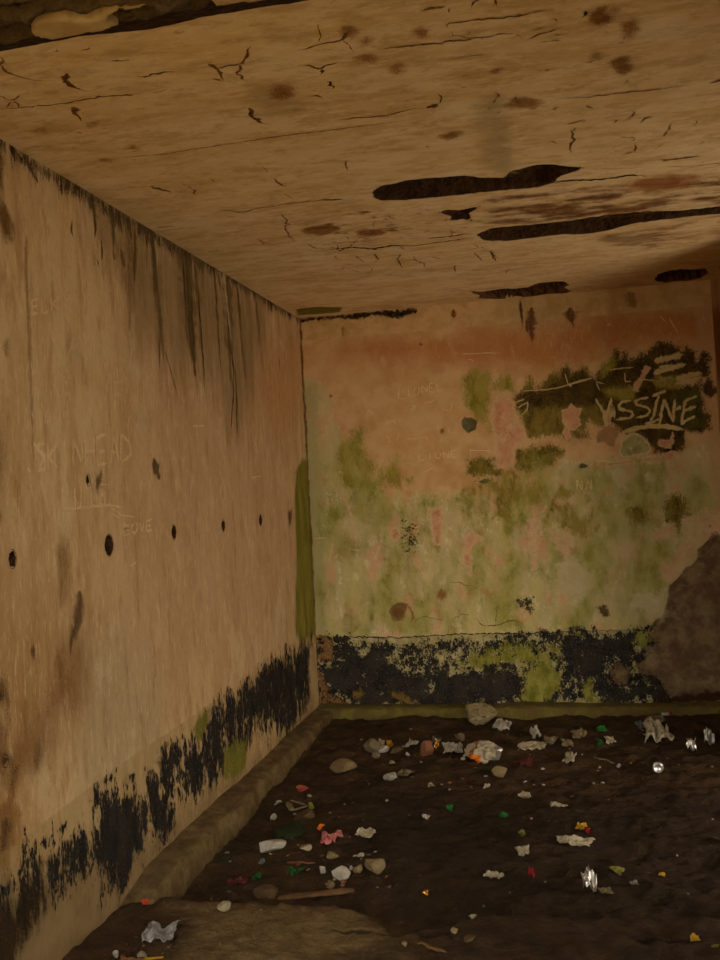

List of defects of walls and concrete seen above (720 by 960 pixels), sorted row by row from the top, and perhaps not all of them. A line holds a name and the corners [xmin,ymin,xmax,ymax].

spalling [0,0,308,51]
crack [0,58,167,134]
crack [123,0,562,158]
crack [219,168,507,273]
spalling [372,164,583,201]
spalling [477,206,720,241]
crack [553,80,720,183]
water stain [0,139,418,460]
water stain [517,340,720,456]
water stain [516,596,535,615]
peeling [0,531,720,927]
water stain [0,855,57,960]